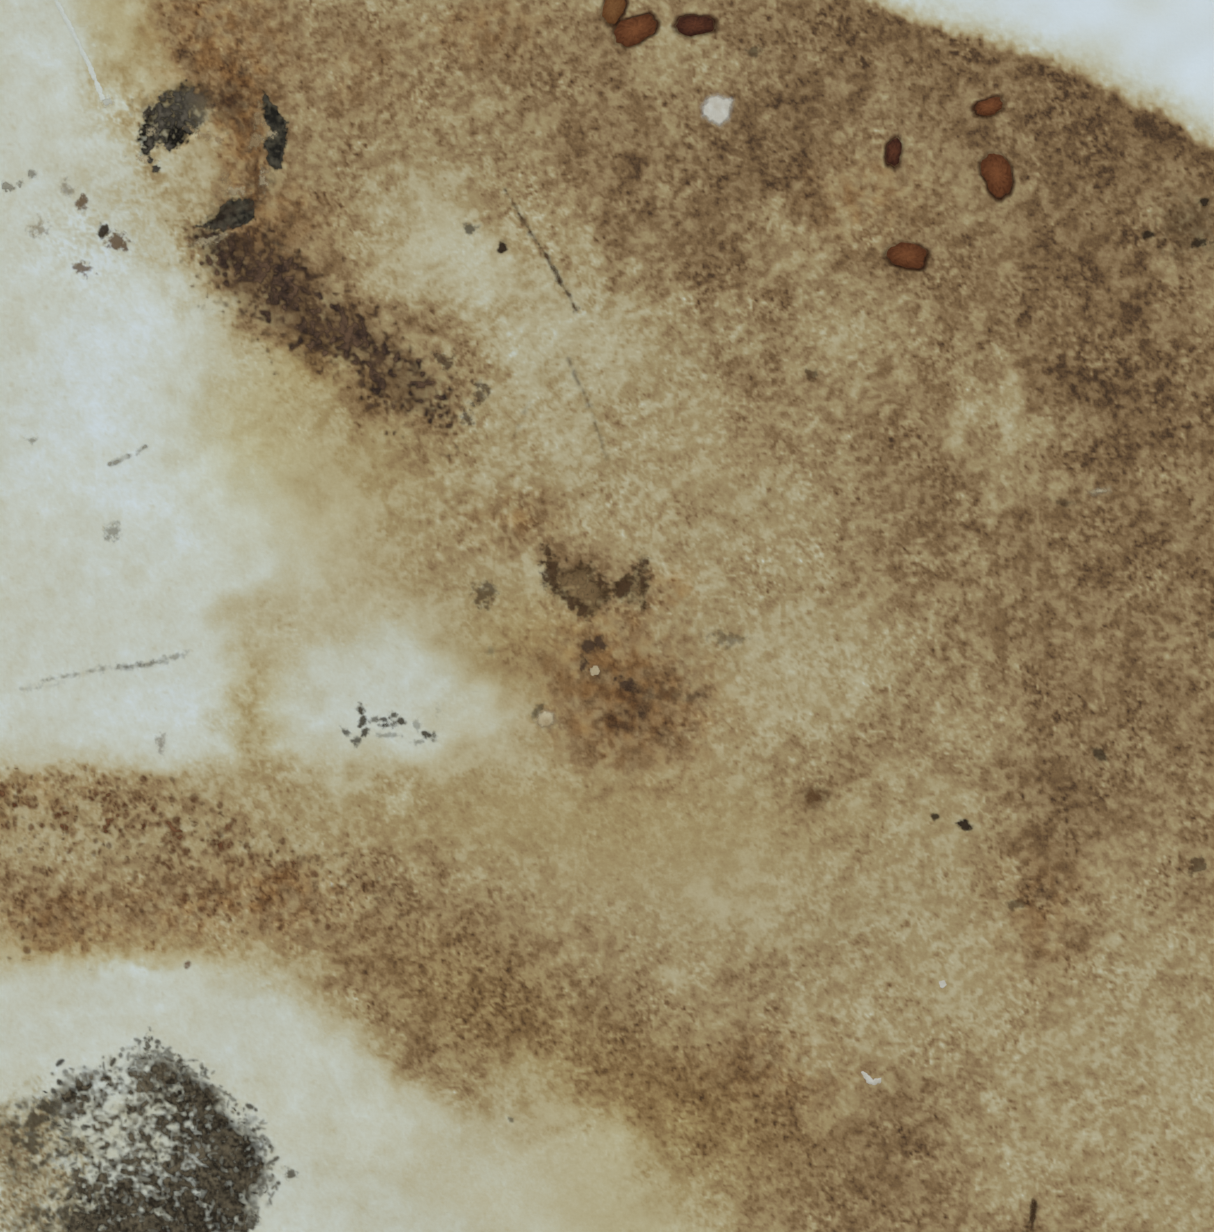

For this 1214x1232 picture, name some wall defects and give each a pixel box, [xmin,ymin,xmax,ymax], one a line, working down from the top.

rust [602,0,717,47]
rust [972,95,1003,118]
rust [884,135,902,169]
rust [979,153,1015,201]
damp [205,232,309,312]
rust [886,242,929,270]
damp [294,317,308,334]
damp [306,320,328,356]
damp [323,304,391,398]
damp [407,379,435,389]
damp [0,733,487,1043]
damp [0,1037,295,1232]